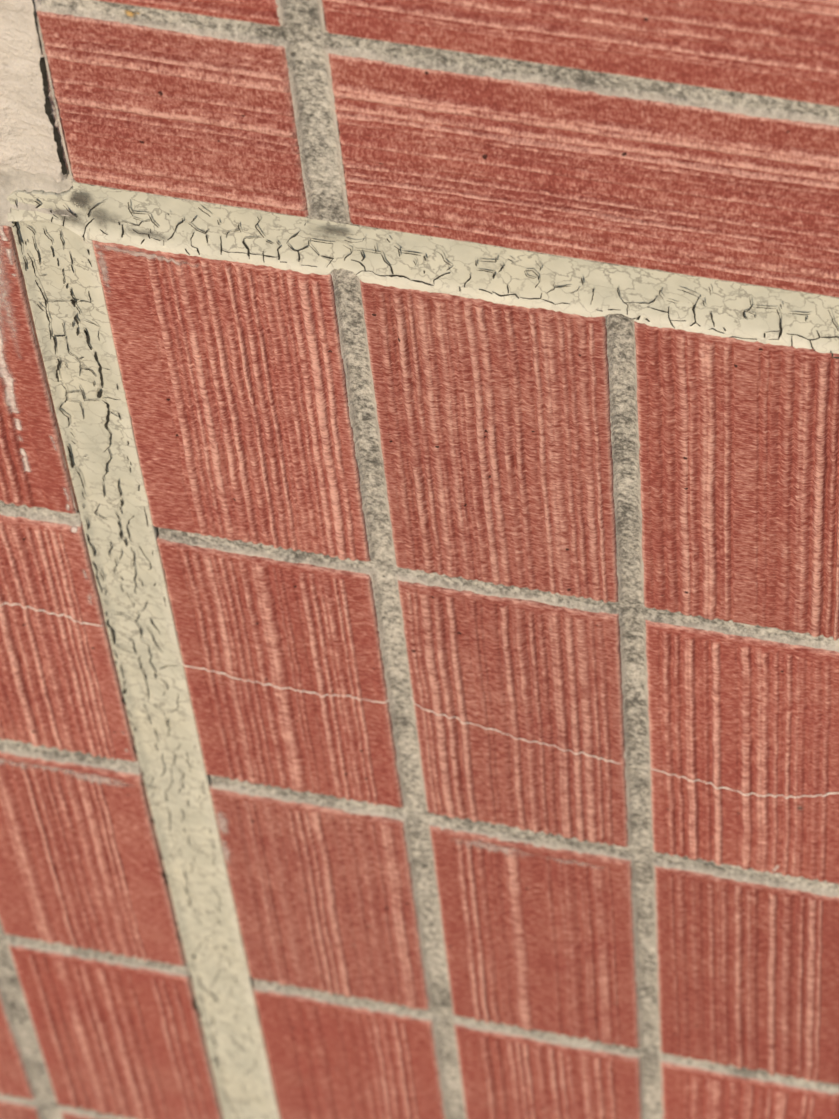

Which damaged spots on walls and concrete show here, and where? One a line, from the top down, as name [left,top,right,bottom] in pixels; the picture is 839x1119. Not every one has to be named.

crack [32,0,67,175]
crack [459,258,839,359]
crack [0,200,452,1119]
crack [409,697,620,764]
crack [649,765,839,799]